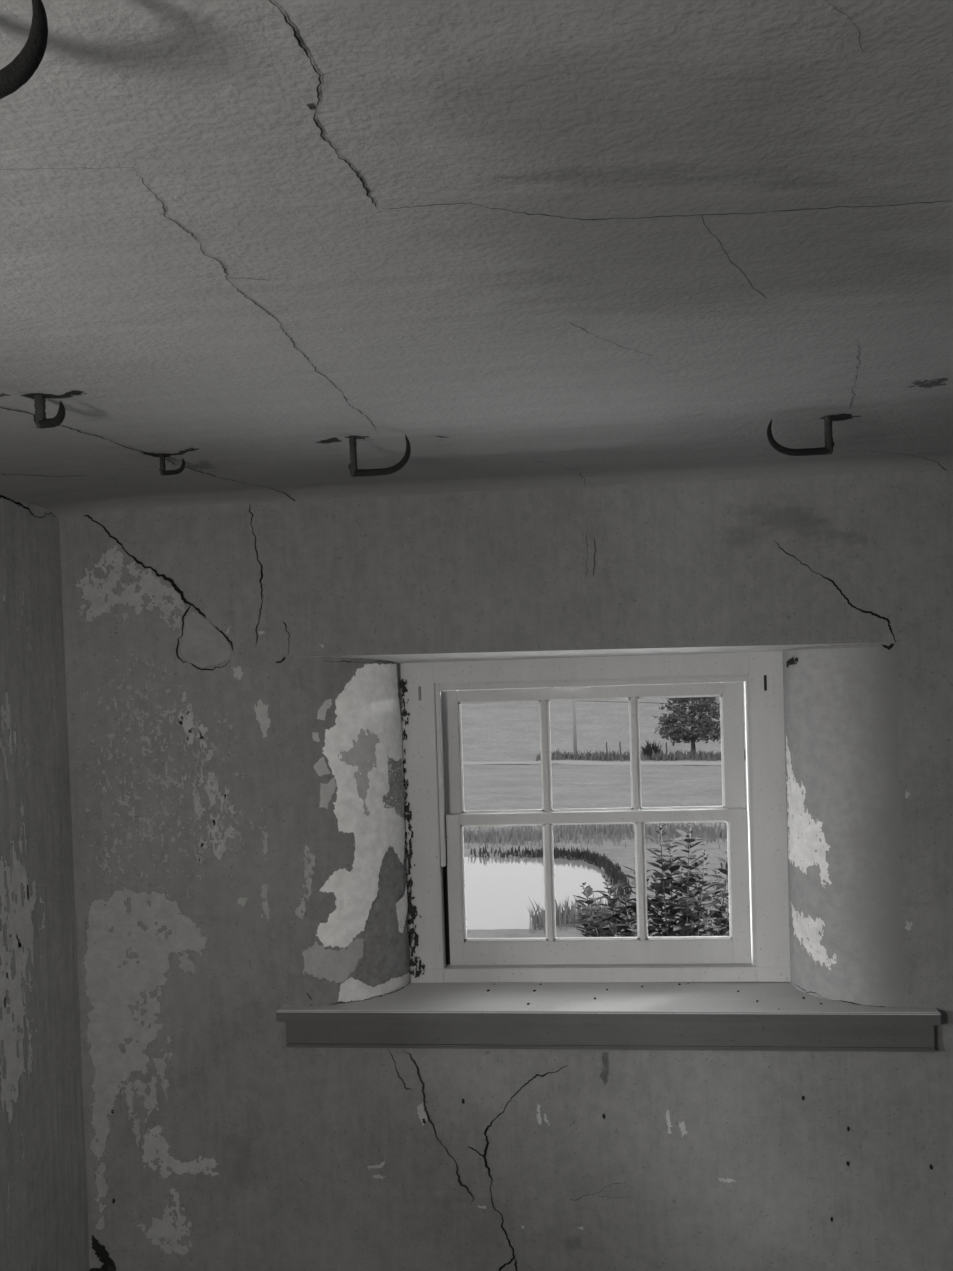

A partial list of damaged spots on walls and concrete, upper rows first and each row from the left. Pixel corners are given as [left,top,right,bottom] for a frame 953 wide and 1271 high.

crack [269,0,947,298]
crack [134,168,378,432]
crack [0,407,295,670]
crack [773,540,896,642]
peeling [0,796,45,1165]
peeling [82,886,219,1271]
peeling [295,663,410,1002]
crack [389,1051,566,1271]
peeling [782,643,913,1007]